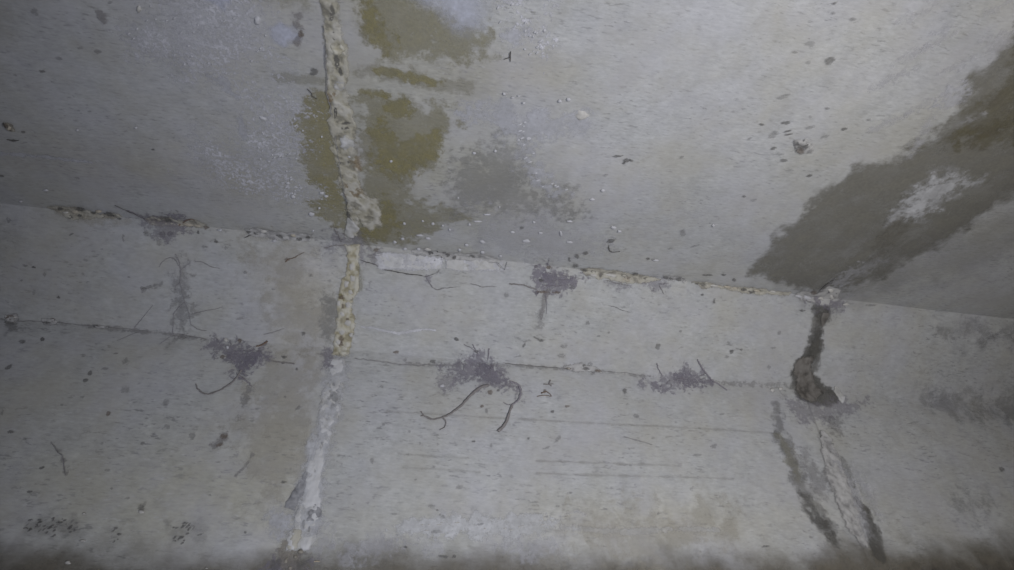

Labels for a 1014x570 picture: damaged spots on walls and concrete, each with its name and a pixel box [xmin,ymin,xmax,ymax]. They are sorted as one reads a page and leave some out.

leakage [107,0,347,228]
leakage [360,0,563,87]
leakage [354,91,590,244]
leakage [750,38,1014,290]
leakage [770,305,845,406]